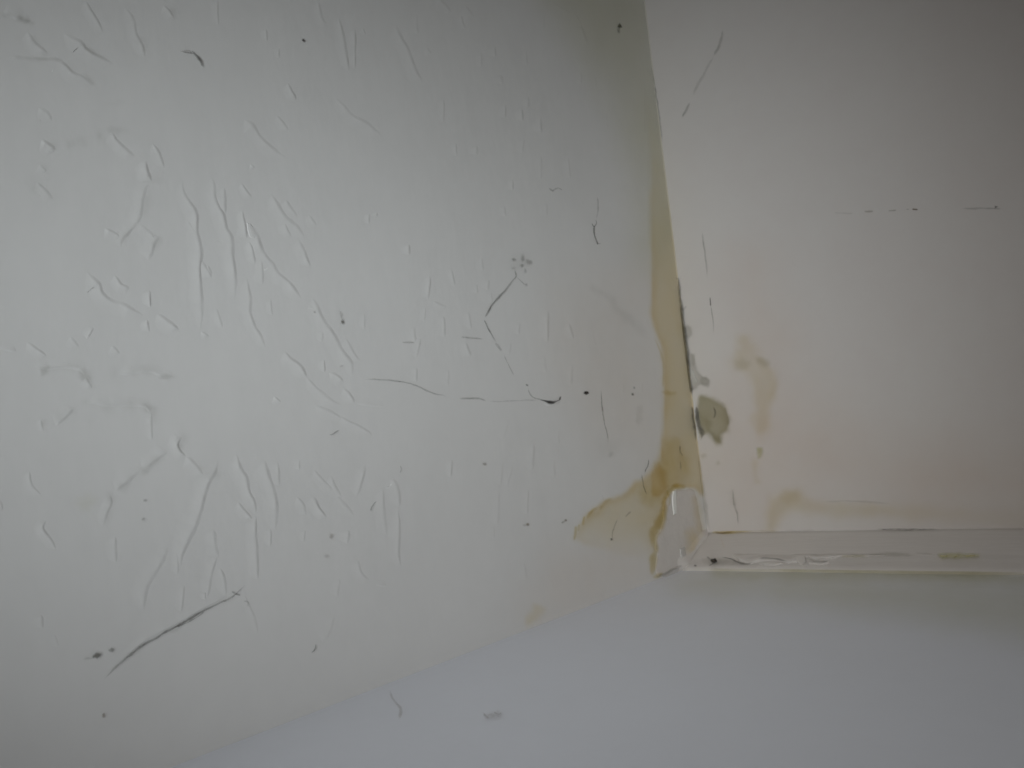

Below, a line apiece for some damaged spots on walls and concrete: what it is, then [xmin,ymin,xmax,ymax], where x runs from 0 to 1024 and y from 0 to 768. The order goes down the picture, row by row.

peeling [655,489,703,577]